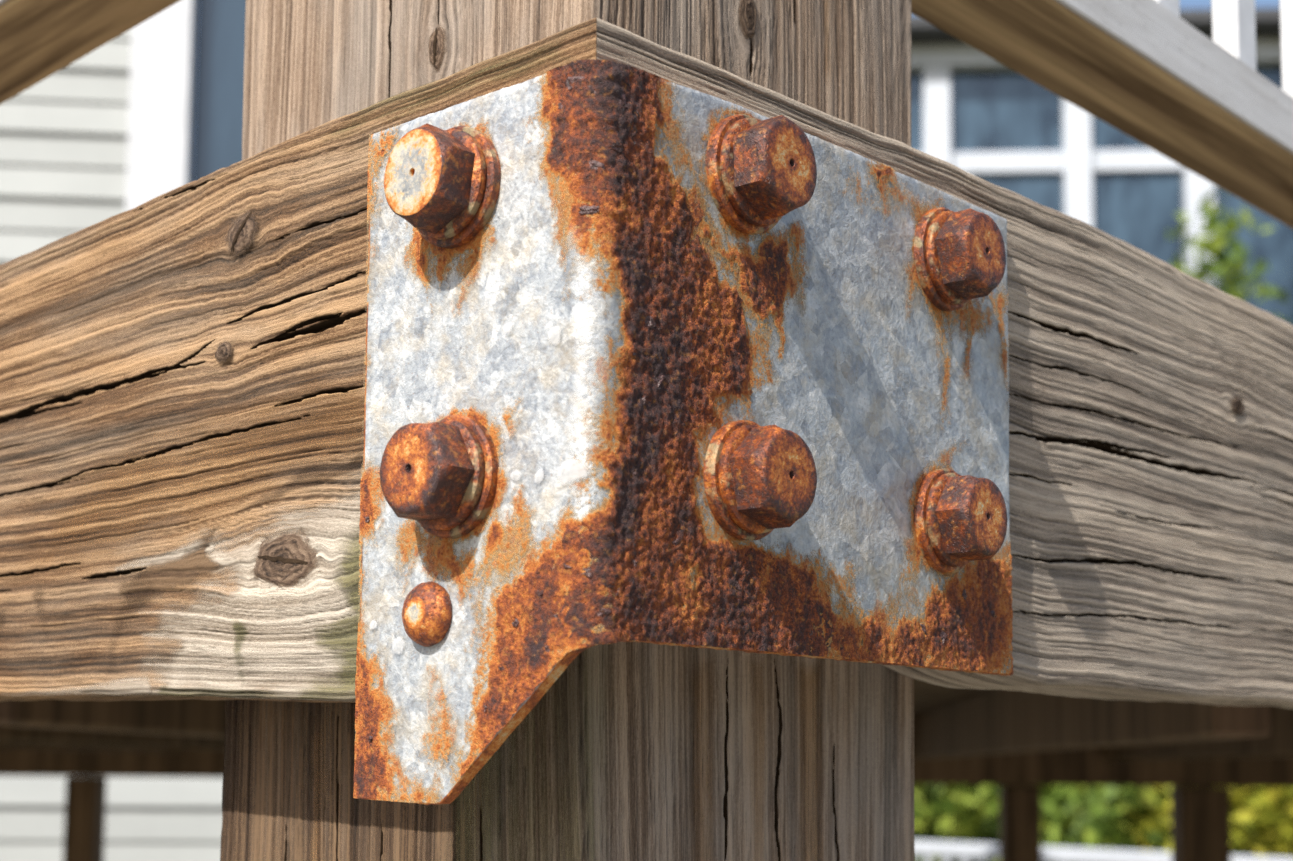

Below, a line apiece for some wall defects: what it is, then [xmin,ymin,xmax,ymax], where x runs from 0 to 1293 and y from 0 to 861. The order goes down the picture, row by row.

crack [0,270,367,424]
crack [1008,311,1146,357]
corrosion [353,59,1013,803]
crack [1009,355,1293,505]
crack [1015,611,1229,627]
crack [1016,555,1293,585]
crack [1116,511,1222,529]
crack [722,663,730,859]
crack [774,659,783,861]
crack [831,743,839,861]